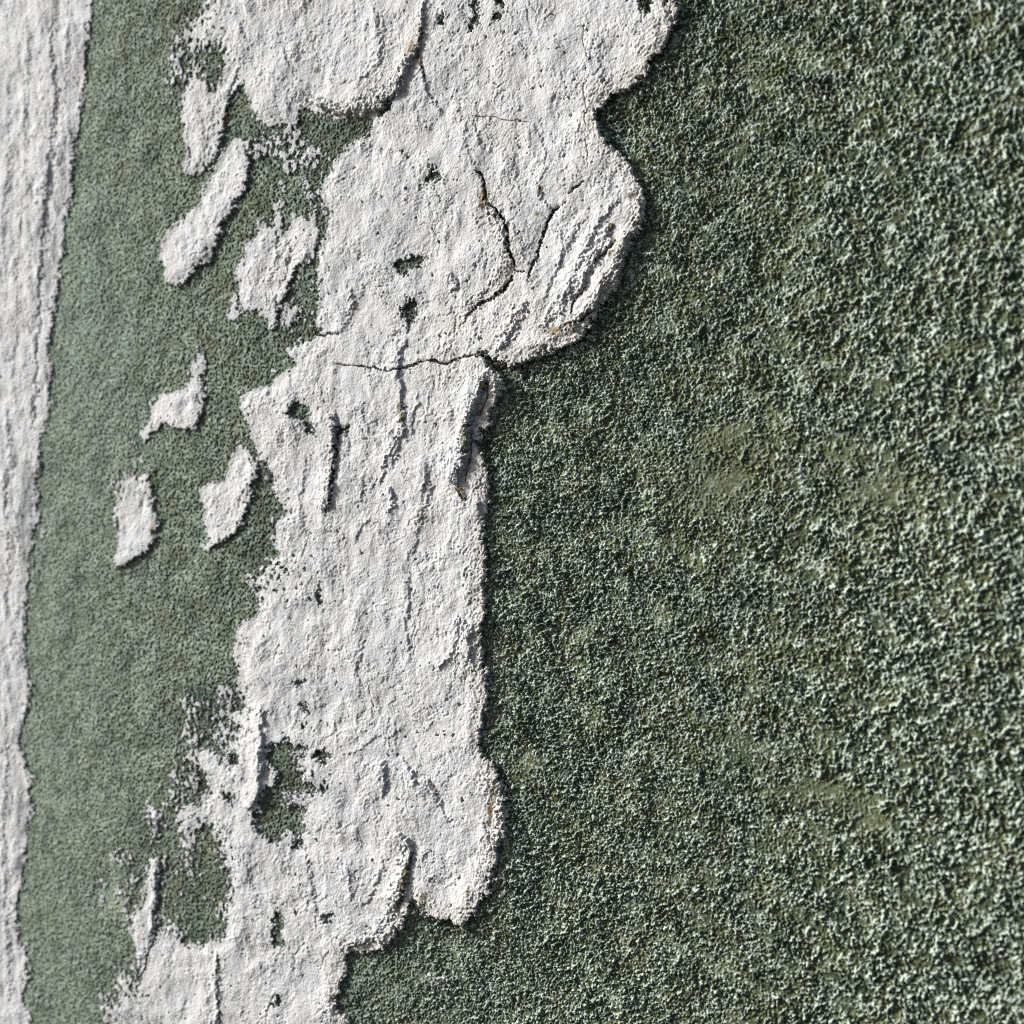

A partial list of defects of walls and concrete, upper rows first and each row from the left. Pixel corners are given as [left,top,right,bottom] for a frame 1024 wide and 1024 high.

spalling [156,0,227,109]
spalling [242,100,392,349]
crack [464,9,590,321]
peeling [111,353,208,569]
spalling [238,455,306,603]
spalling [287,401,316,435]
crack [333,353,492,502]
spalling [108,677,246,949]
spalling [253,737,332,849]
spalling [86,948,150,1024]
spalling [271,907,286,949]